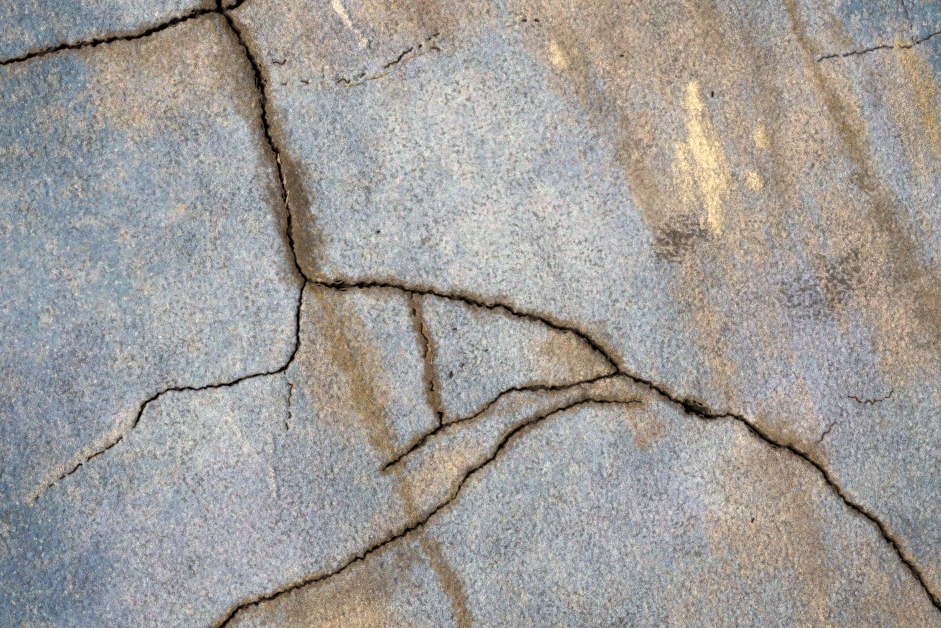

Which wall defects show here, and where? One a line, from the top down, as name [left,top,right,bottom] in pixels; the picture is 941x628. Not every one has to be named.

crack [0,8,217,66]
crack [283,33,441,88]
crack [817,0,941,63]
crack [215,0,290,207]
crack [133,203,941,628]
crack [49,436,123,487]